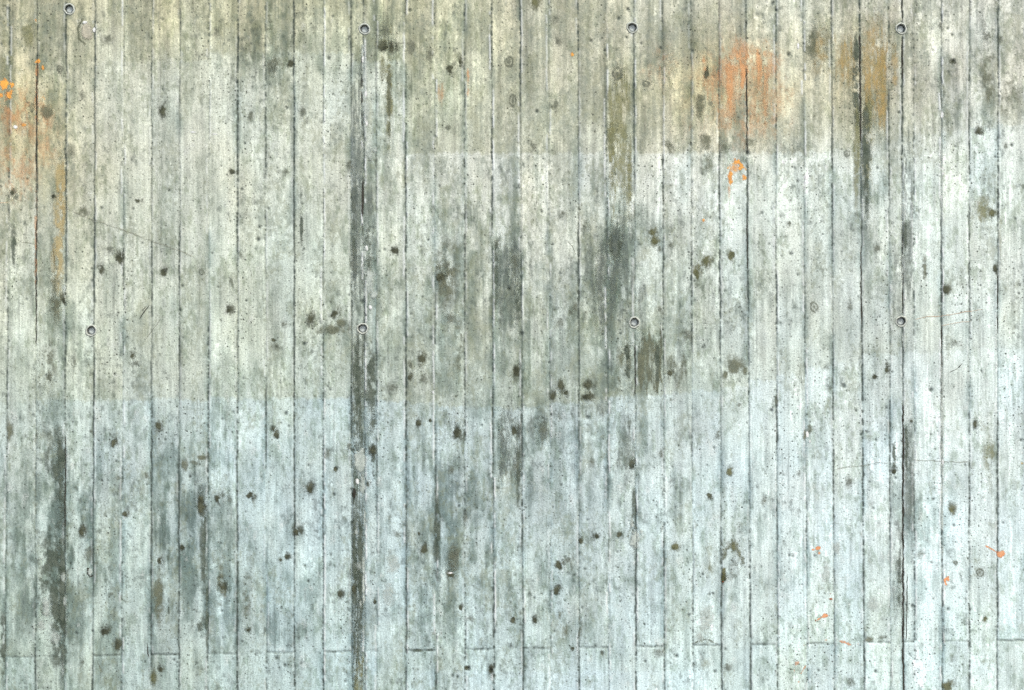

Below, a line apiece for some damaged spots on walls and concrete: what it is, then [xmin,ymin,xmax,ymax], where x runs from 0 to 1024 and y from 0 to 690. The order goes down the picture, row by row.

rust [0,78,14,111]
rust [840,37,897,212]
water stain [348,86,372,294]
rust [728,158,747,185]
water stain [494,239,520,319]
water stain [598,227,627,296]
water stain [618,330,686,392]
water stain [36,432,65,500]
water stain [306,311,377,690]
water stain [40,528,68,665]